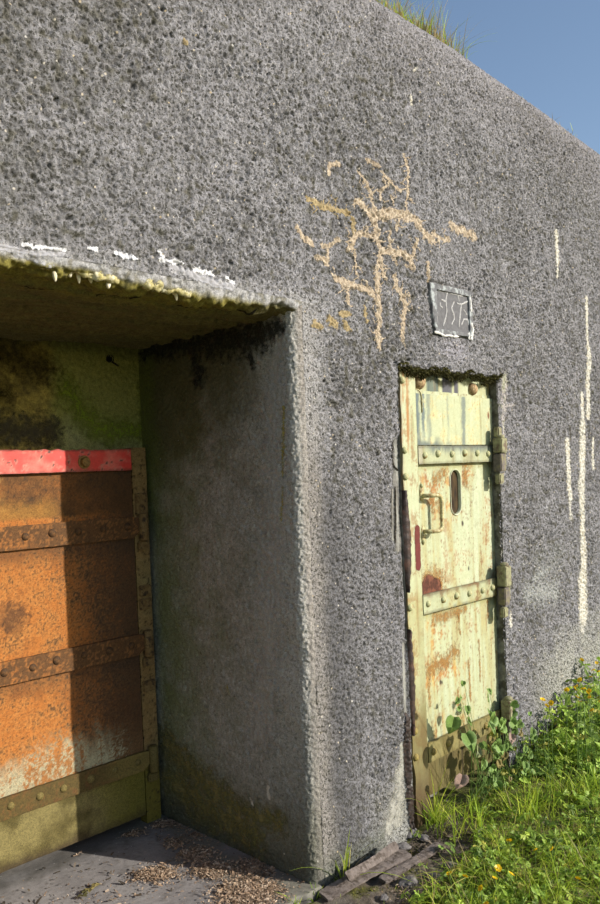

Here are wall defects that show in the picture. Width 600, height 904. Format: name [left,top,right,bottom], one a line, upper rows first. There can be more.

leakage [138,316,286,388]
corrosion [422,565,446,594]
corrosion [432,605,467,635]